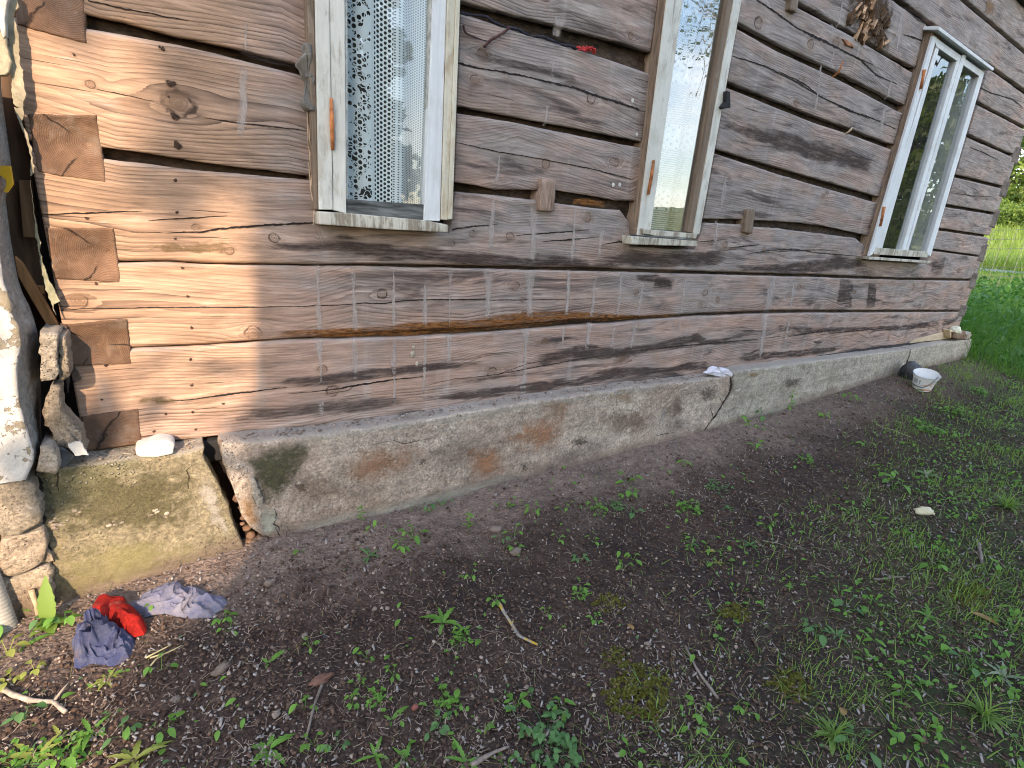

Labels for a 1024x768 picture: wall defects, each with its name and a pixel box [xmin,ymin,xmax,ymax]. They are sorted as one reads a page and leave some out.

crack [704,378,732,430]